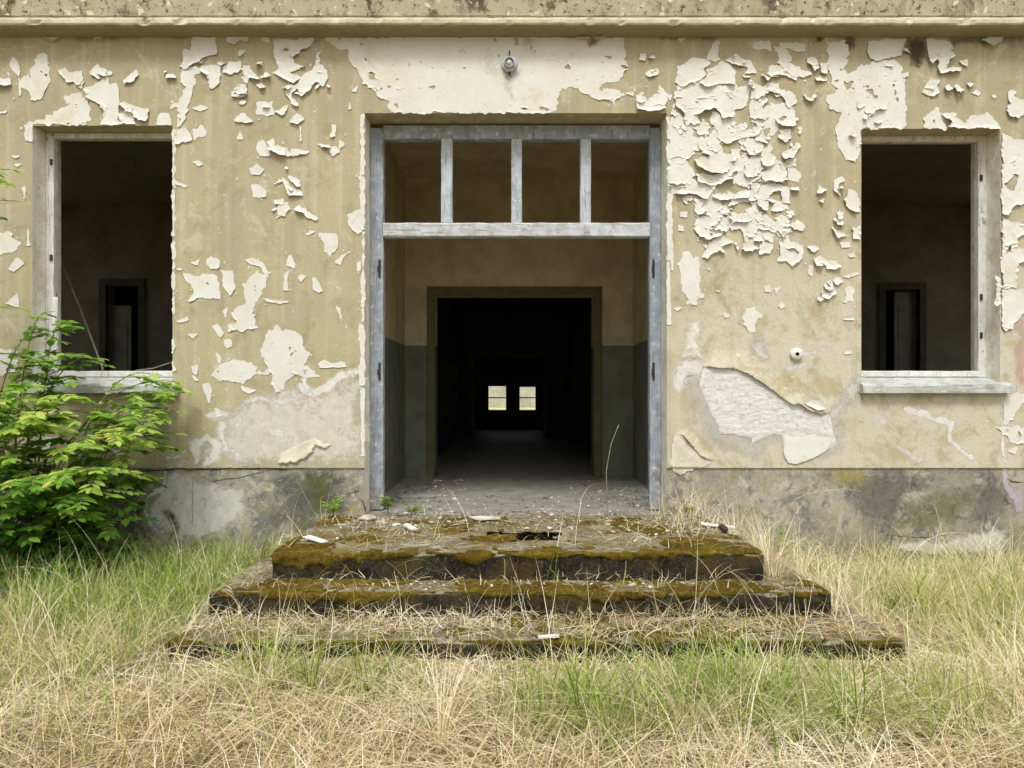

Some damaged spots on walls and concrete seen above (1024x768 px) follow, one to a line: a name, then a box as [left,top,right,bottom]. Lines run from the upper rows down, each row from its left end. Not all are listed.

peeling [0,35,910,464]
peeling [918,37,1024,331]
damp [18,368,366,551]
flaking render [668,428,715,475]
damp [1002,468,1017,499]
peeling [996,384,1024,457]